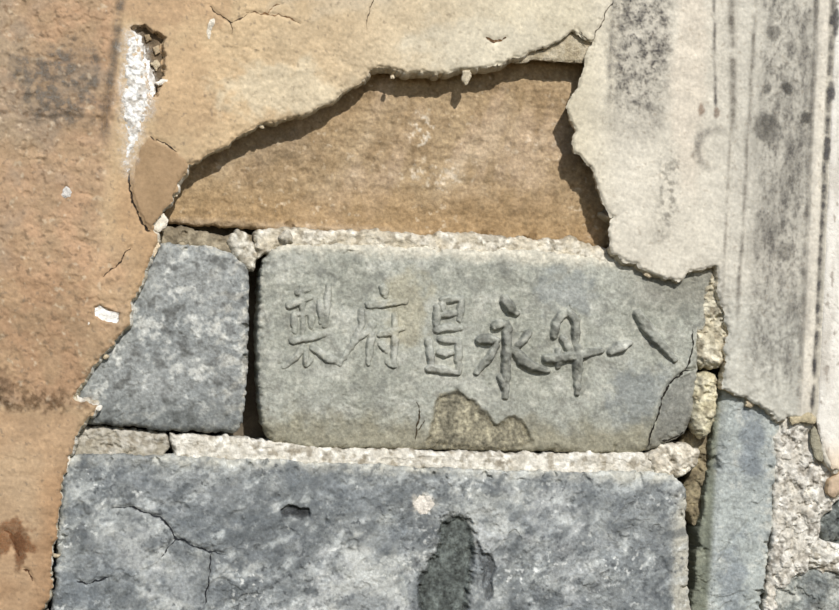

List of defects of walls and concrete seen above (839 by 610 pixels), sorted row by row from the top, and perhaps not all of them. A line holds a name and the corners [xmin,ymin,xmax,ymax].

crack [210,4,301,31]
damp [617,0,668,108]
damp [784,100,813,128]
flaking render [591,169,682,284]
damp [758,211,785,254]
damp [782,133,811,216]
flaking render [43,26,593,610]
crack [647,329,694,447]
flaking render [688,266,835,475]
crack [115,506,220,604]